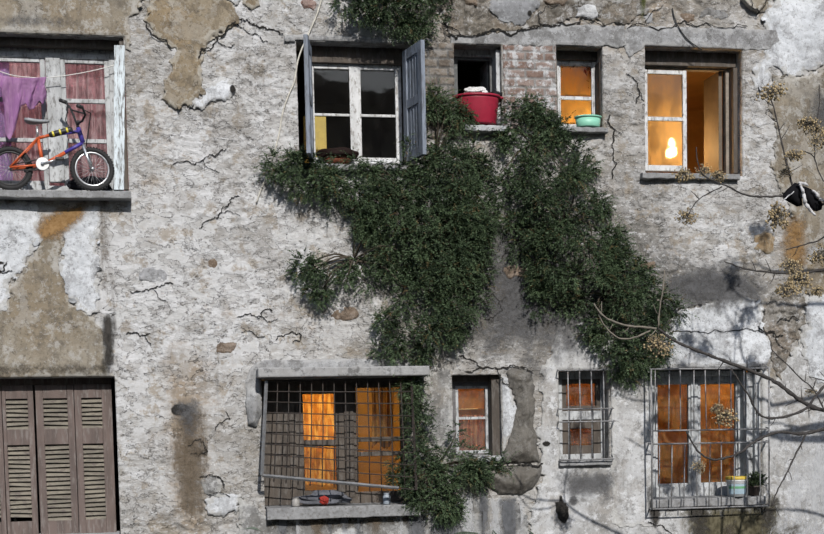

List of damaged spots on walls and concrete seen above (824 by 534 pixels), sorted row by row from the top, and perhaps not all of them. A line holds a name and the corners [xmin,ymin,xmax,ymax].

flaking render [0,0,260,111]
spalling [425,0,653,141]
crack [607,115,622,179]
flaking render [0,199,114,378]
flaking render [515,0,824,534]
spalling [216,342,236,353]
flaking render [420,369,453,454]
crack [459,355,533,386]
flaking render [502,376,517,449]
leakage [174,401,206,514]
flaking render [204,493,411,534]
leakage [689,508,710,534]